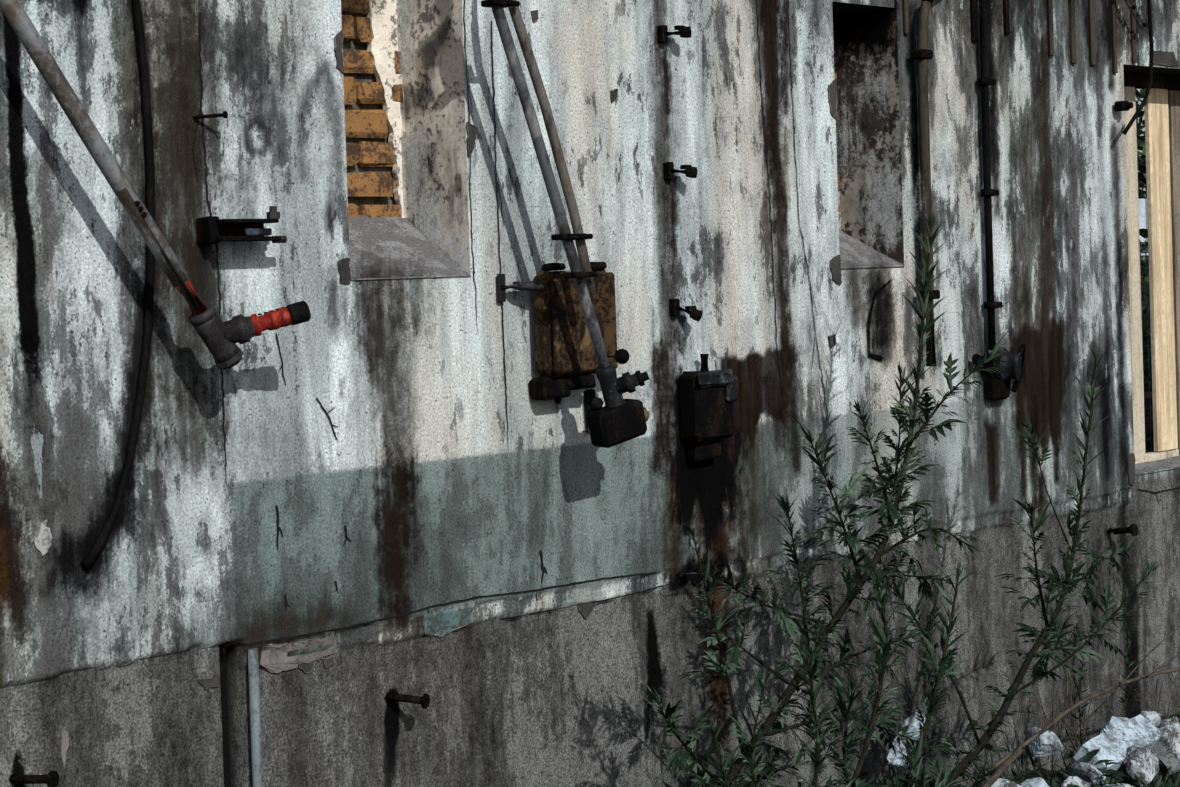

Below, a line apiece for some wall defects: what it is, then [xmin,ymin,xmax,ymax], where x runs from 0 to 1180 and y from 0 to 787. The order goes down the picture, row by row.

leakage [73,0,87,15]
spalling [334,29,344,73]
flaking render [367,0,477,272]
leakage [651,0,686,473]
leakage [759,0,800,471]
leakage [1032,0,1056,371]
spalling [260,635,337,673]
peeling [421,601,475,638]
spalling [577,600,597,620]
corrosion [667,347,789,741]
corrosion [985,422,1000,505]
corrosion [1009,316,1067,528]